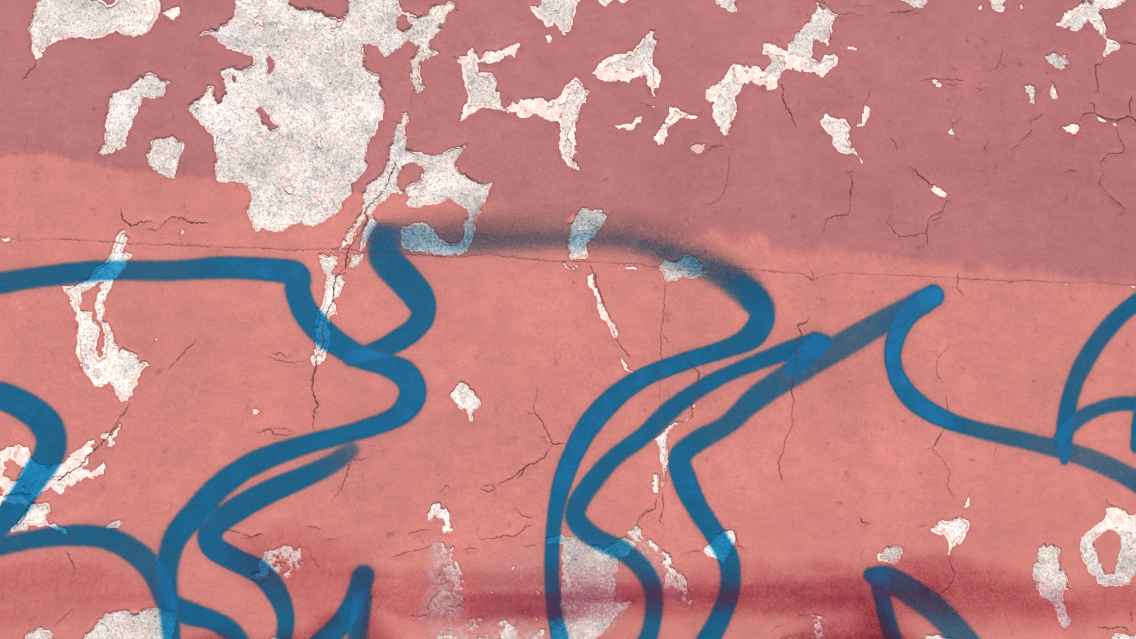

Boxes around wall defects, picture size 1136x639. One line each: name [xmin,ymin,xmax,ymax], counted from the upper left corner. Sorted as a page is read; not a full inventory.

peeling [25,0,183,61]
peeling [97,71,174,157]
peeling [186,0,858,368]
crack [921,38,1010,90]
crack [1065,61,1136,211]
peeling [59,227,150,403]
crack [1,160,1136,499]
peeling [0,421,124,536]
crack [465,514,541,550]
flaking render [522,526,692,639]
peeling [1032,542,1073,630]
peeling [1078,506,1136,588]